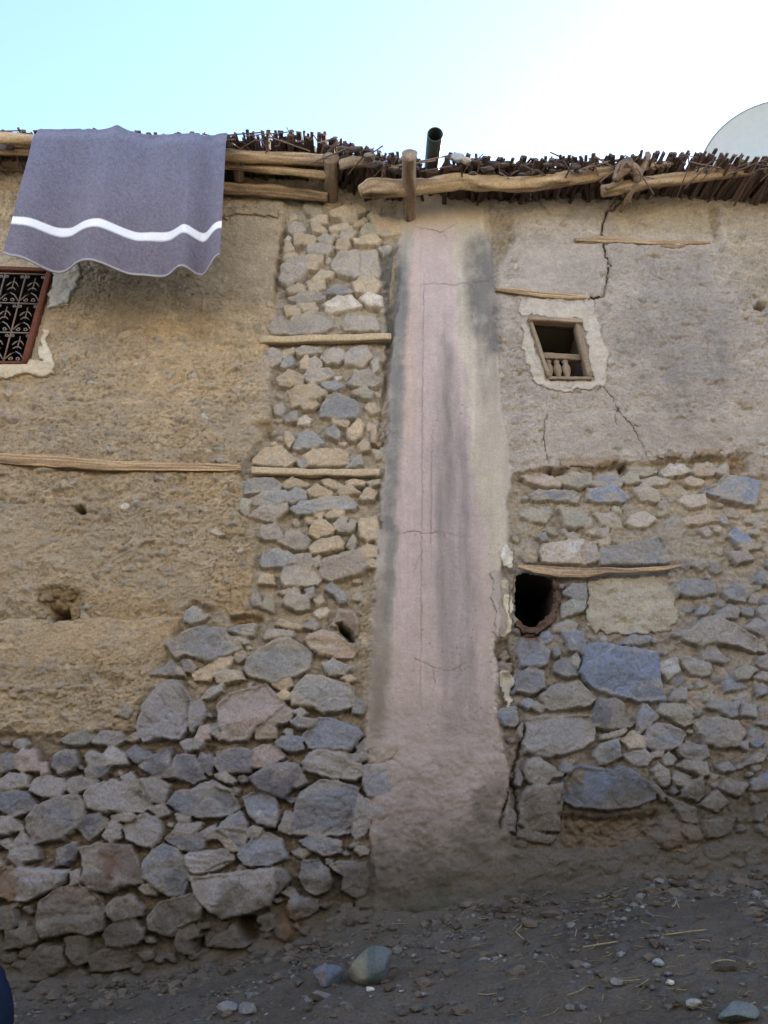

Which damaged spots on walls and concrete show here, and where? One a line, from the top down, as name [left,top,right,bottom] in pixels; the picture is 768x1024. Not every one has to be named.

damp [382,252,394,304]
crack [590,205,619,300]
crack [597,387,647,458]
crack [404,274,478,706]
crack [499,724,526,833]